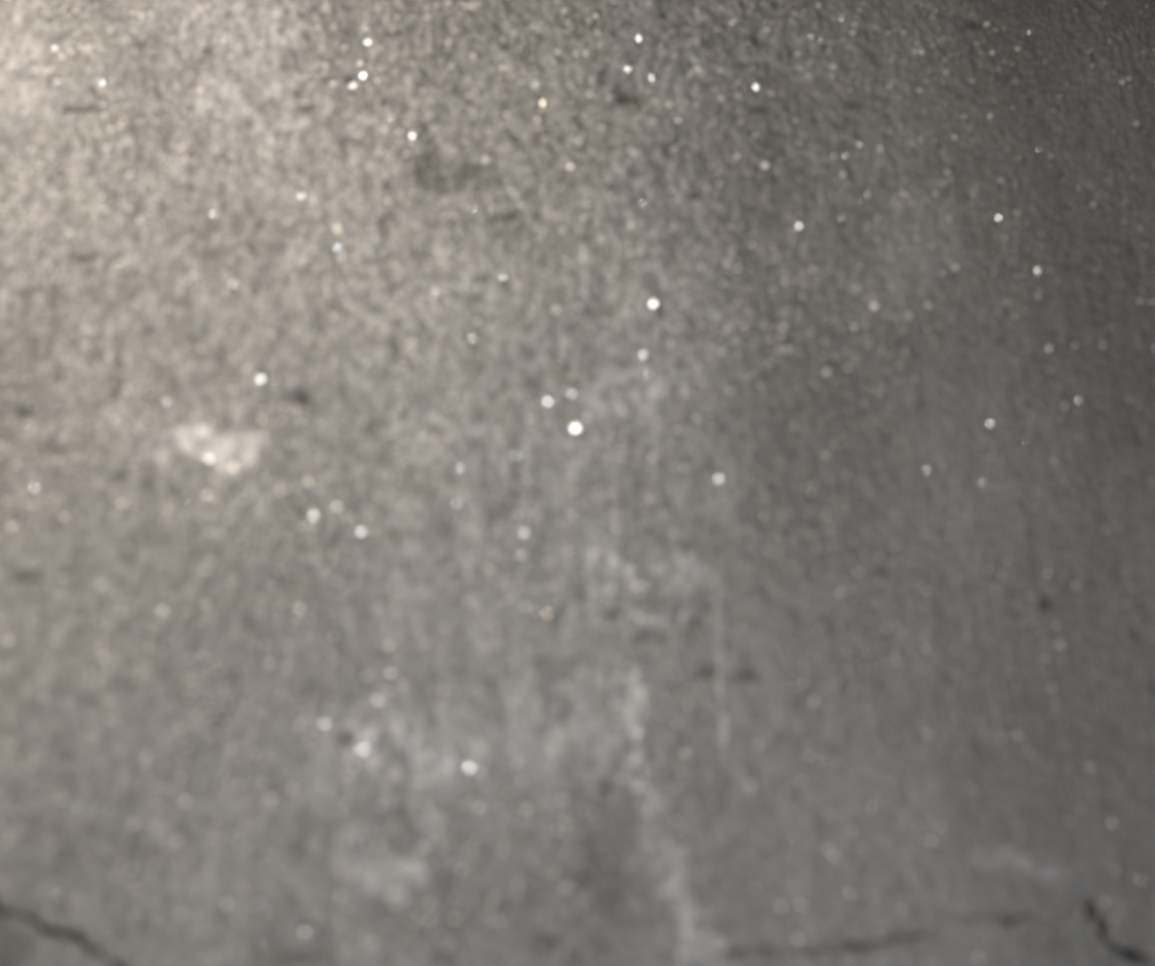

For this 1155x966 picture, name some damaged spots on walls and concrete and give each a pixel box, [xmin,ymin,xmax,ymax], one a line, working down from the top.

crack [0,910,119,966]
crack [1081,902,1150,963]